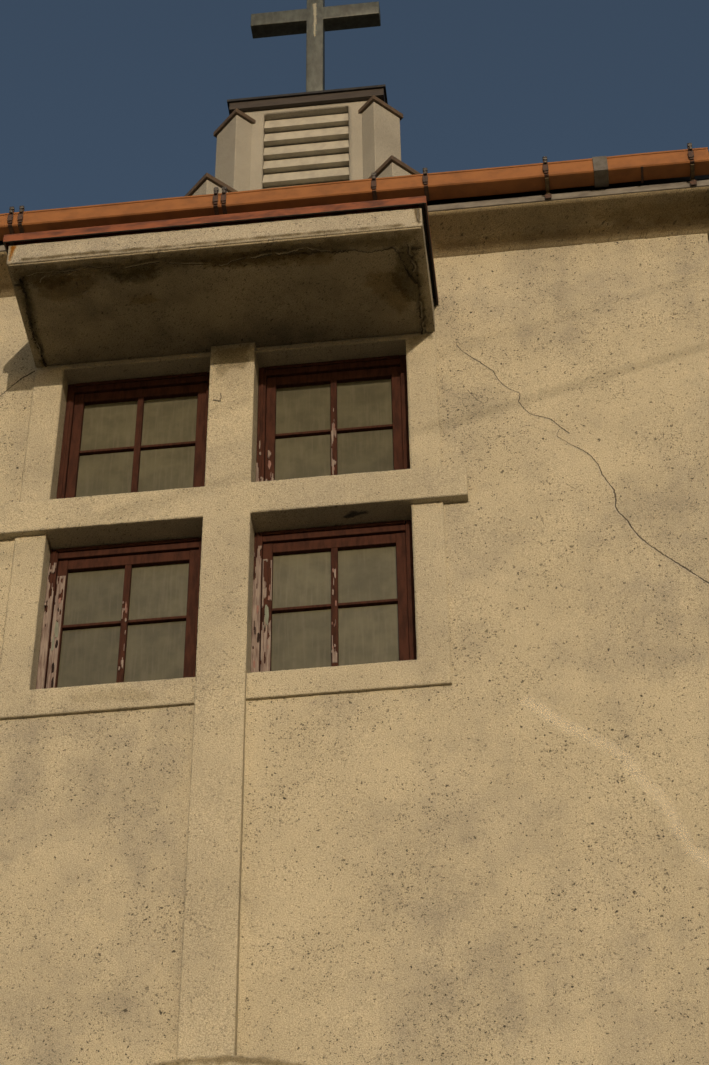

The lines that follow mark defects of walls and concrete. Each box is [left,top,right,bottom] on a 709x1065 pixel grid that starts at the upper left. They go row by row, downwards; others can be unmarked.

peeling [256,441,274,482]
crack [456,342,709,585]
peeling [36,563,66,689]
peeling [251,546,272,673]